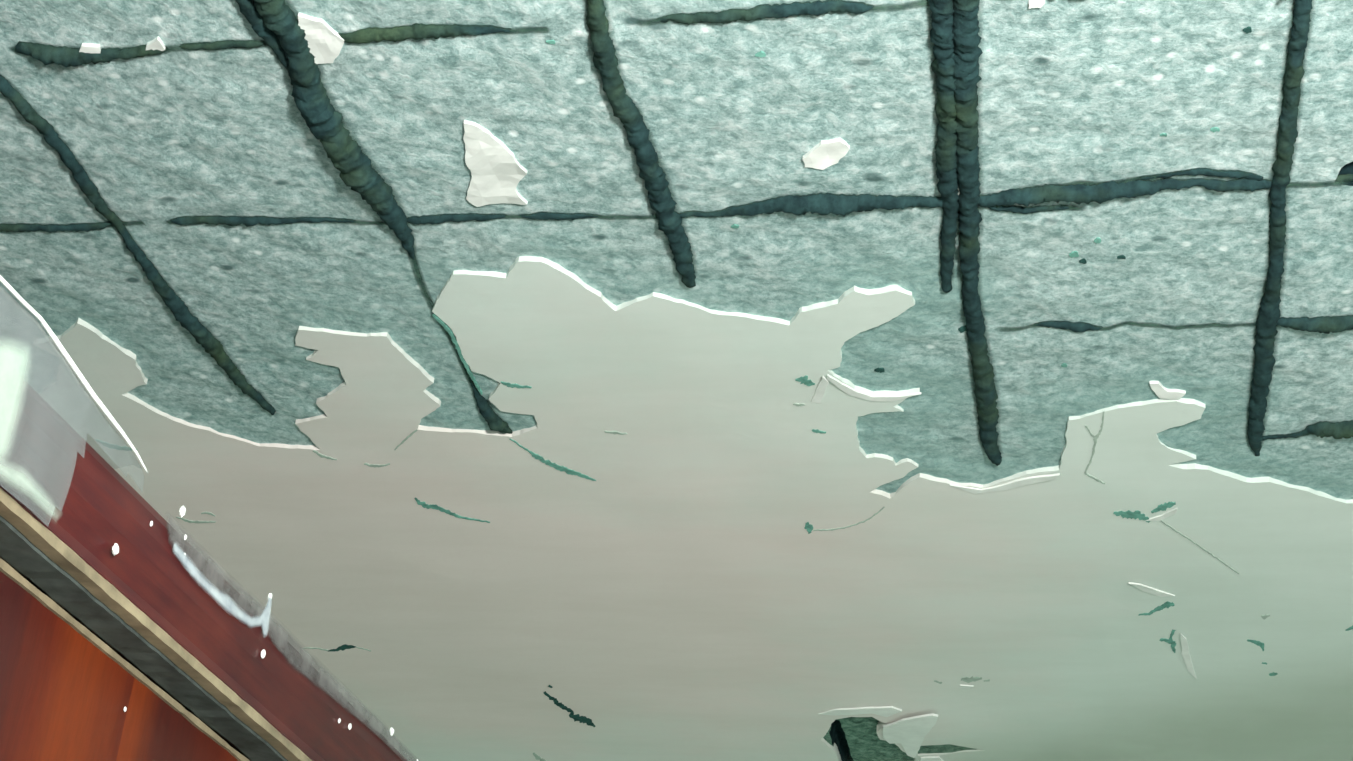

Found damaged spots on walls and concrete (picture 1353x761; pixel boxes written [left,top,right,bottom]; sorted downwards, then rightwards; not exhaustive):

spalling [0,0,1353,500]
crack [543,685,596,727]
spalling [818,706,976,761]